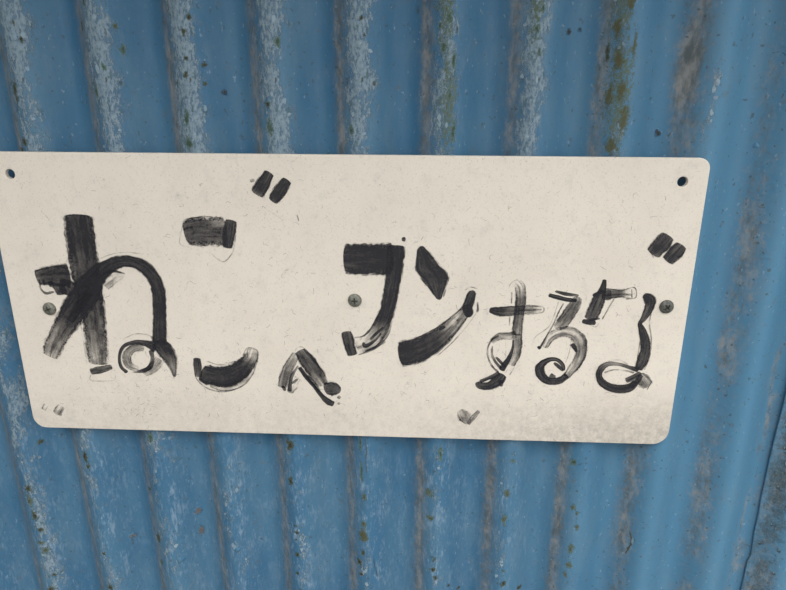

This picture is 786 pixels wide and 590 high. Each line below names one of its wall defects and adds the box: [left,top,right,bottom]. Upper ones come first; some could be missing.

corrosion [25,485,51,554]
corrosion [357,521,369,576]